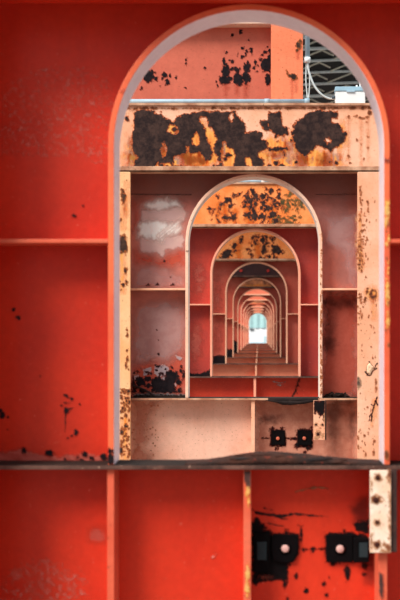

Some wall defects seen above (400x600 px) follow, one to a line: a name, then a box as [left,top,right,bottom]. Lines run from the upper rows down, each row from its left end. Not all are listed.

rust [121,106,372,166]
rust [120,180,128,293]
rust [206,186,286,224]
rust [218,233,285,259]
rust [355,186,375,278]
rust [357,287,379,347]
peeling [131,355,185,396]
rust [60,393,81,439]
rust [108,388,159,465]
rust [370,469,391,553]